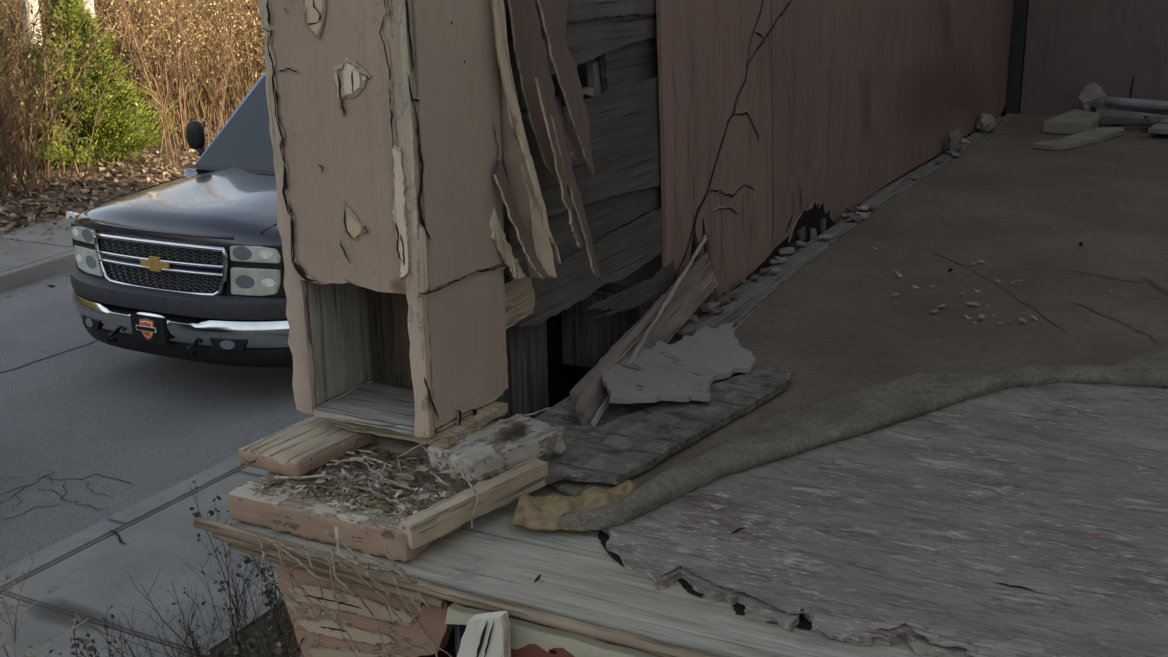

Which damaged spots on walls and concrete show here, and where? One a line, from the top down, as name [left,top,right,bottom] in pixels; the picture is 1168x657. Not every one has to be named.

peeling [300,0,326,40]
peeling [332,57,370,116]
crack [673,0,792,282]
peeling [340,201,365,262]
peeling [390,145,432,295]
peeling [760,196,876,274]
crack [417,265,507,299]
hole [546,311,592,407]